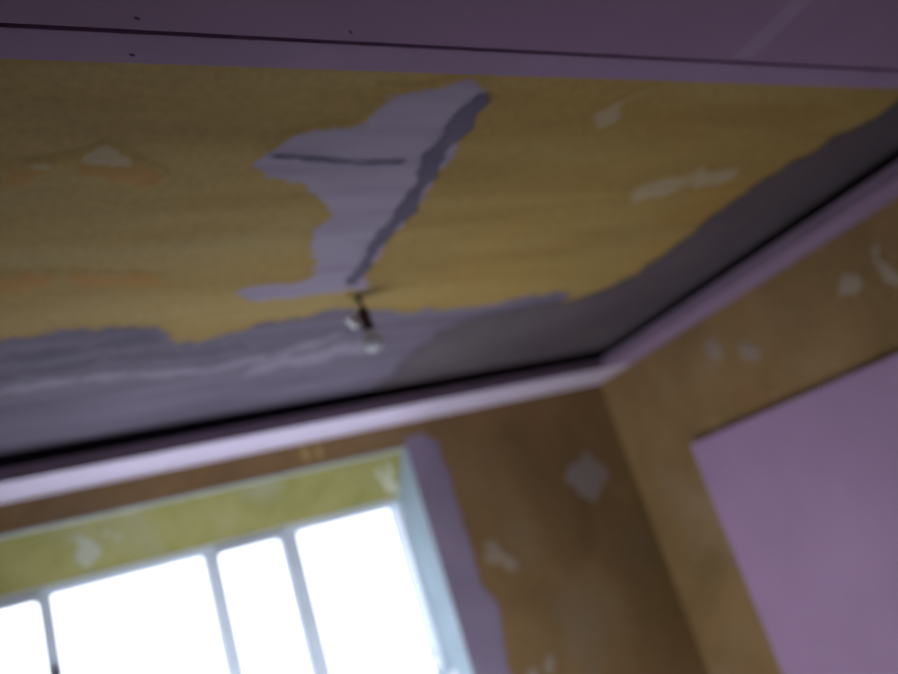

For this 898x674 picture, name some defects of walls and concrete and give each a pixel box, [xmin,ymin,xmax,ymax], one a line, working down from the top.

peeling [348,101,898,405]